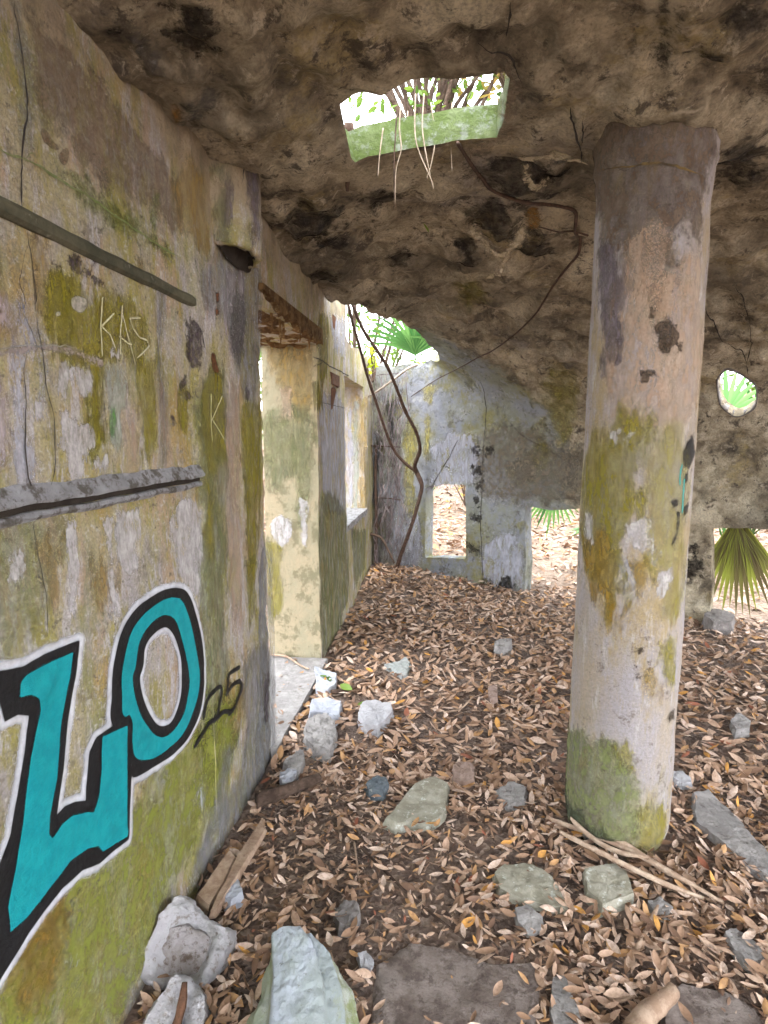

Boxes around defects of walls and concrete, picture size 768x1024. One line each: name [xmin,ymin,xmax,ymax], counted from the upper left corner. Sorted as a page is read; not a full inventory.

water stain [720,5,768,40]
crack [0,2,181,258]
water stain [495,68,522,136]
water stain [284,202,349,250]
water stain [357,189,403,213]
crack [19,232,56,486]
water stain [455,121,768,621]
water stain [202,258,430,628]
crack [33,526,48,636]
water stain [613,741,635,775]
water stain [633,803,666,851]